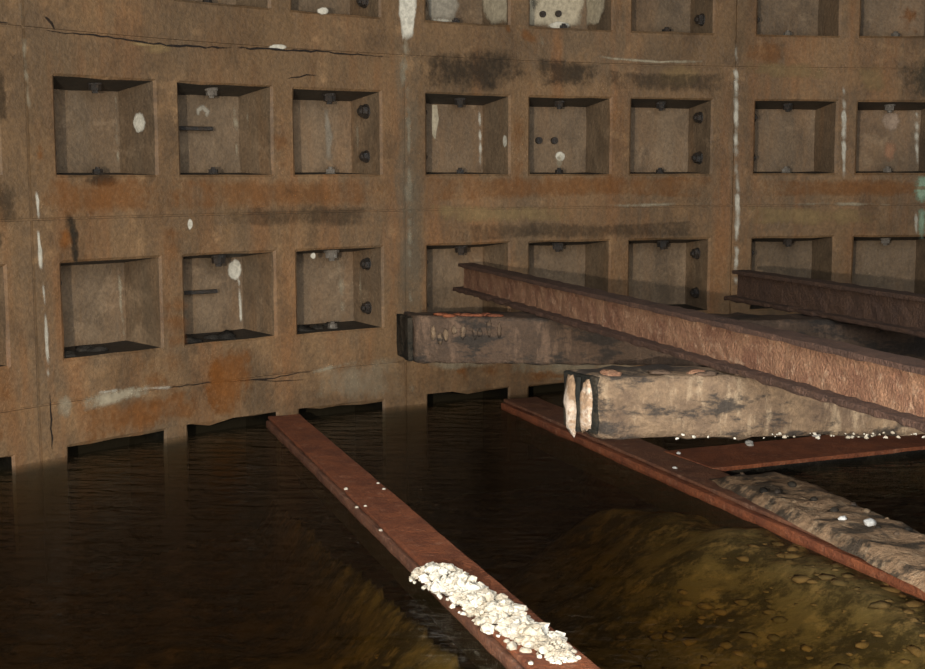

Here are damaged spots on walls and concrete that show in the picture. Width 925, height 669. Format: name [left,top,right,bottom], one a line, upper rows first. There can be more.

crack [45,17,383,78]
water stain [399,0,416,51]
water stain [69,218,78,262]
crack [47,399,55,443]